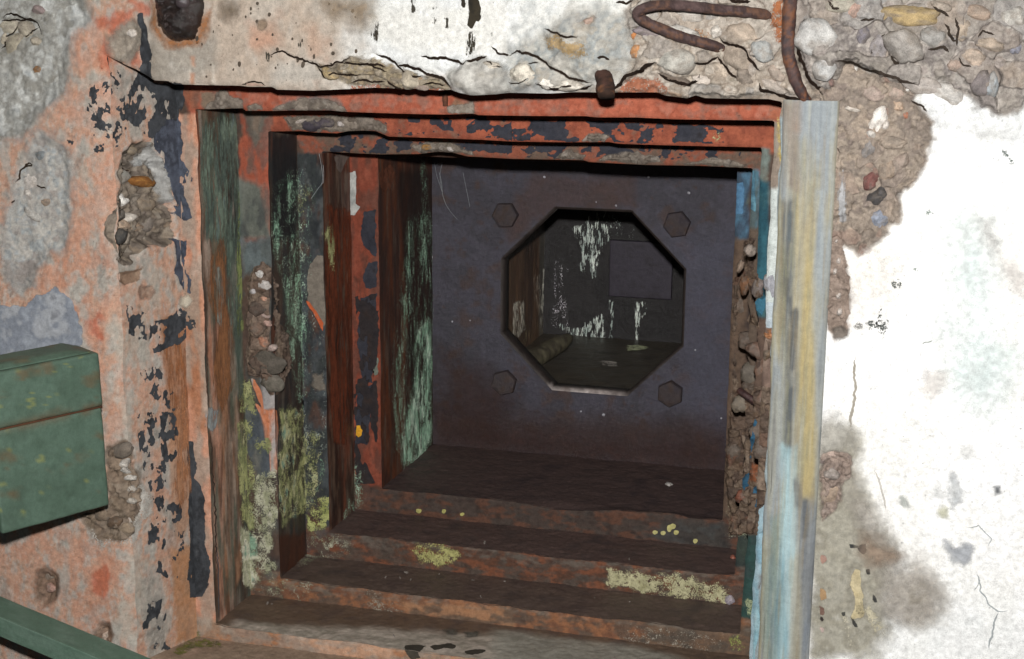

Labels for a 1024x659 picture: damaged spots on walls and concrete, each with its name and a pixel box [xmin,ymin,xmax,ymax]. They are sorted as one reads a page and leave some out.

spalling [87,13,193,294]
rust [151,7,209,48]
crack [242,79,265,87]
spalling [206,0,1024,339]
spalling [82,367,211,598]
rust [164,326,192,505]
rust [207,242,234,413]
spalling [245,261,292,472]
spalling [720,237,772,536]
leakage [810,420,935,659]